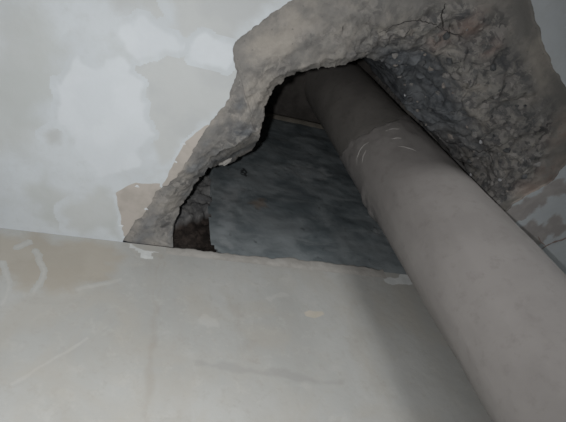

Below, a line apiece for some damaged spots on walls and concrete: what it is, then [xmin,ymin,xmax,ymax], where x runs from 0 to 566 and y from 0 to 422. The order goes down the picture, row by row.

damp [93,0,288,40]
crack [379,4,458,35]
damp [0,0,124,242]
damp [135,55,237,171]
spalling [113,0,566,252]
damp [208,167,253,255]